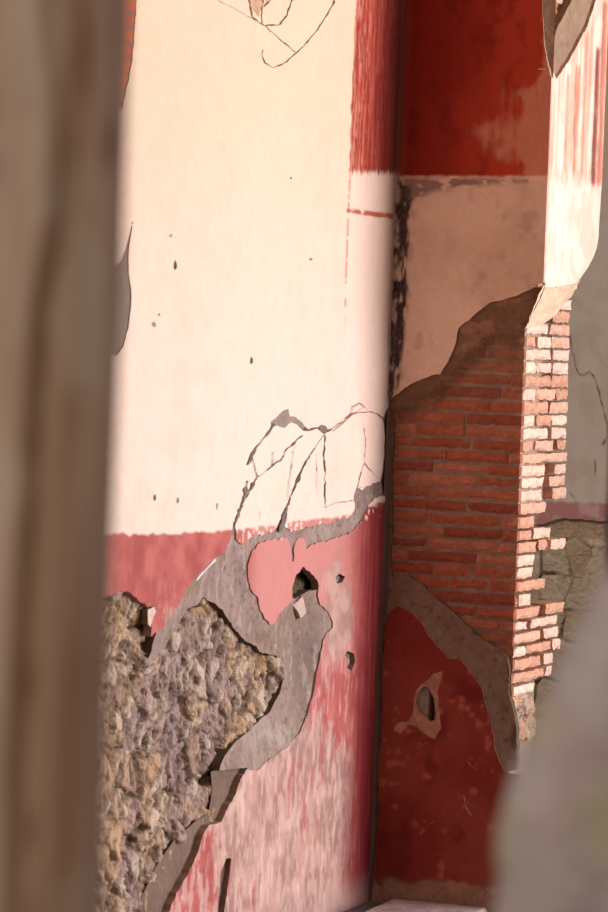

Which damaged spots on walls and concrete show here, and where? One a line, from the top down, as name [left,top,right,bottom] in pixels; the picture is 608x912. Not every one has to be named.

crack [220,0,335,68]
flaking render [538,0,593,77]
damp [388,181,411,399]
crack [232,403,384,535]
crack [569,333,608,474]
flaking render [101,279,605,912]